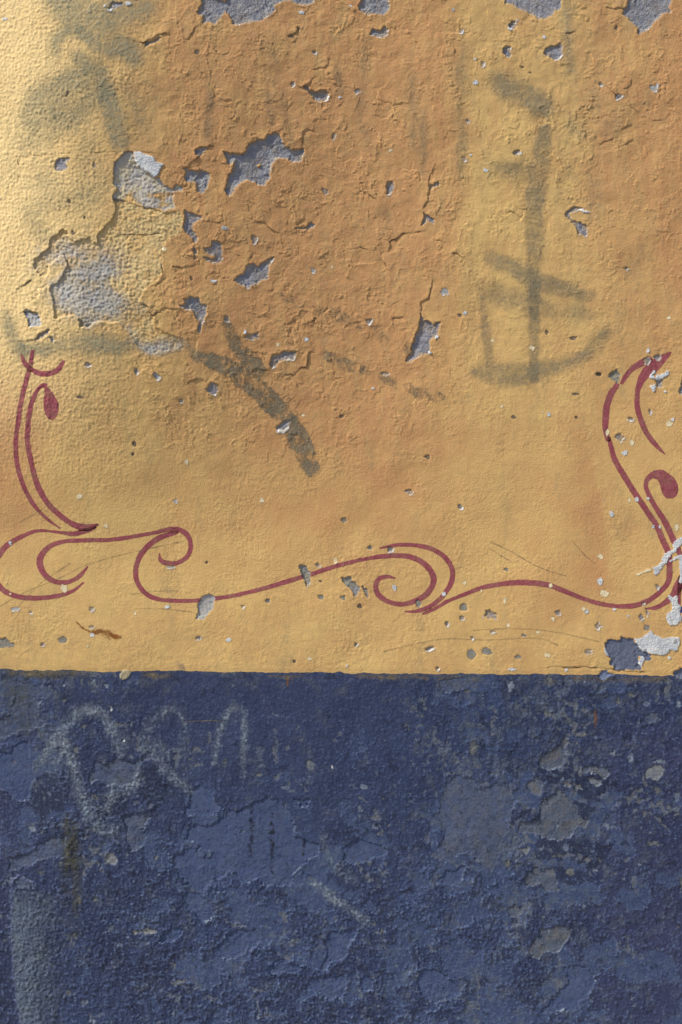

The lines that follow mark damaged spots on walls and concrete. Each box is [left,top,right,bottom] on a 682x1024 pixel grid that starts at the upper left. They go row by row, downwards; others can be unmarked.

peeling [197,0,314,25]
peeling [615,0,672,35]
peeling [224,132,304,196]
peeling [565,207,589,237]
peeling [24,151,224,354]
peeling [234,257,275,289]
peeling [406,315,440,362]
peeling [576,602,680,685]